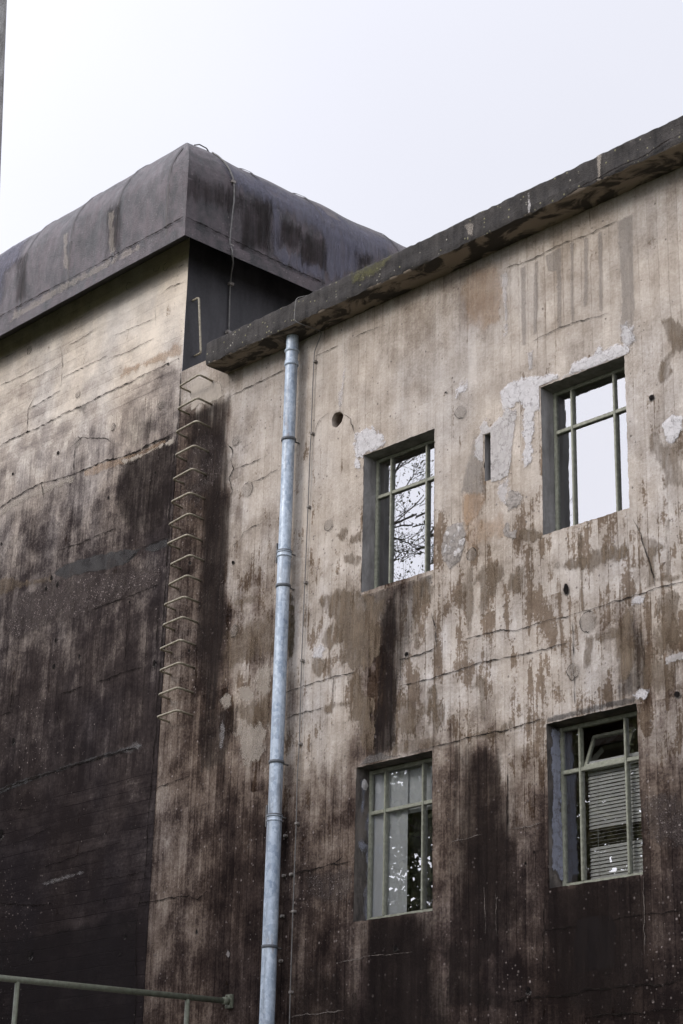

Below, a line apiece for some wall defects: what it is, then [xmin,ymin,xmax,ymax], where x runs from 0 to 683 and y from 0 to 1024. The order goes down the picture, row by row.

crack [0,315,207,1024]
leakage [312,587,445,764]
spalling [441,523,466,569]
leakage [457,562,523,630]
leakage [584,607,634,680]
leakage [649,542,683,664]